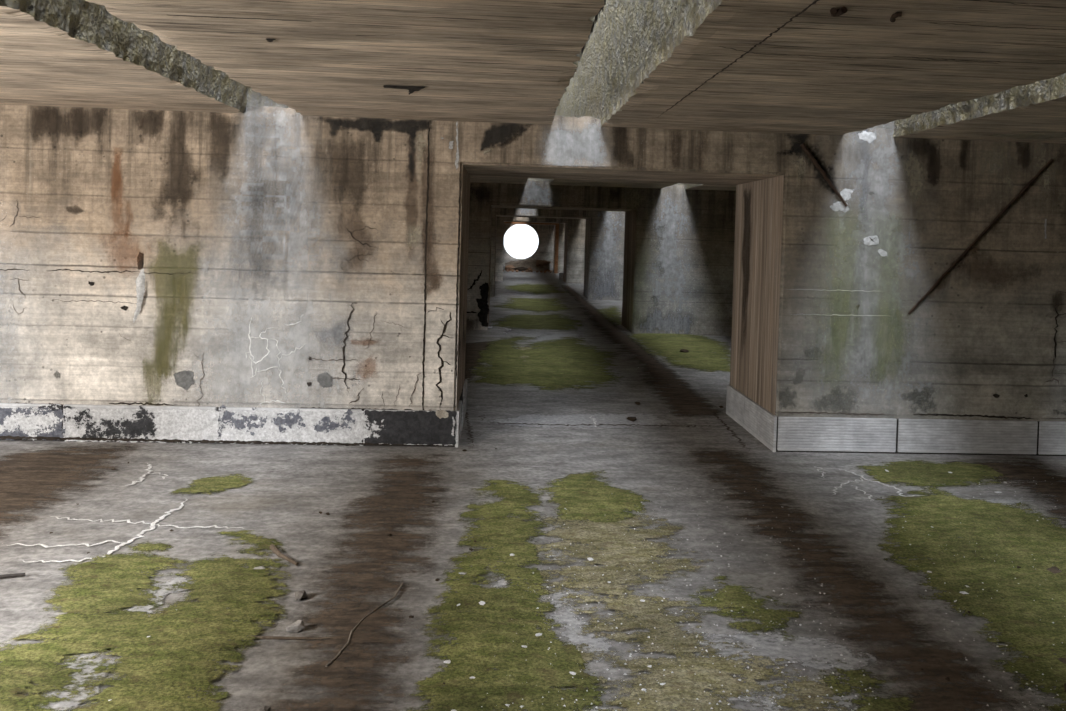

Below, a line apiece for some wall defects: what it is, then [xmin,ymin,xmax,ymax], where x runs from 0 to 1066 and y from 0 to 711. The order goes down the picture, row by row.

crack [657,0,1031,118]
water stain [32,106,103,146]
water stain [137,110,197,224]
water stain [910,138,940,184]
water stain [144,351,168,401]
crack [0,177,750,486]
spalling [476,283,489,327]
water stain [805,134,935,413]
rust [908,159,1053,315]
crack [1046,291,1066,384]
peeling [0,403,457,446]
crack [9,499,244,563]